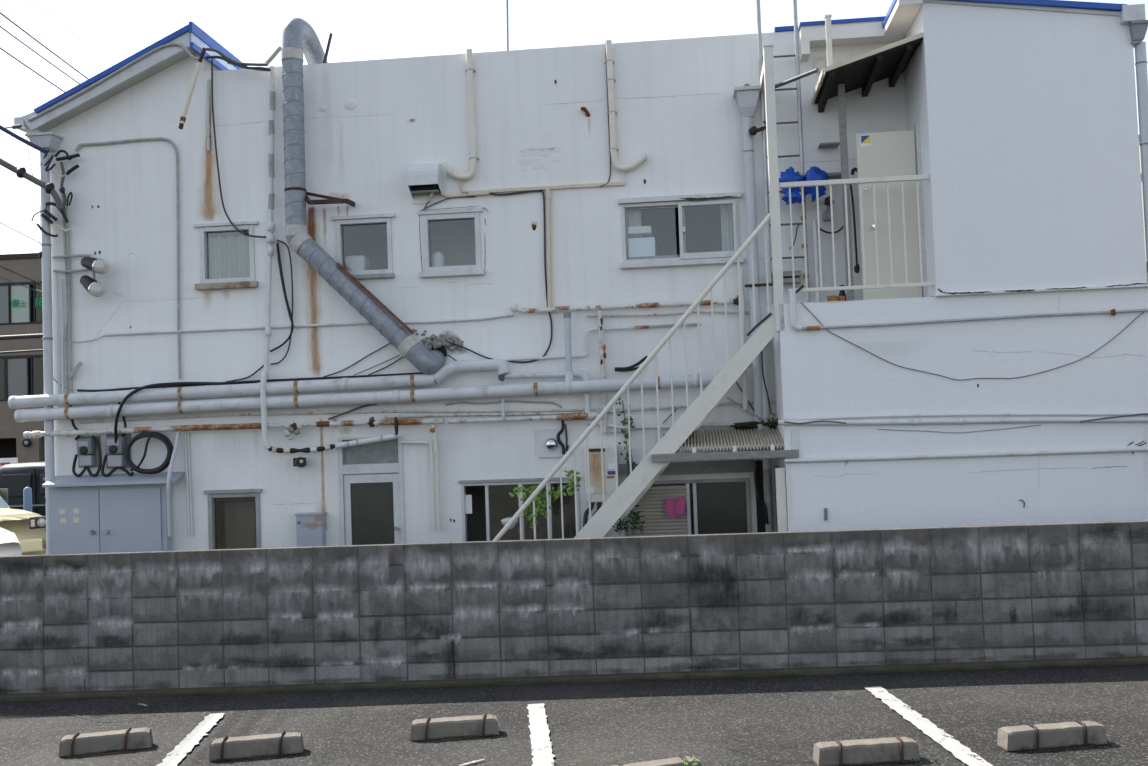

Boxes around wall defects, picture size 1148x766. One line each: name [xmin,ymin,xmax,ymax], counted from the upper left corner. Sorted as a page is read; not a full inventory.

water stain [788,548,862,558]
water stain [379,583,542,595]